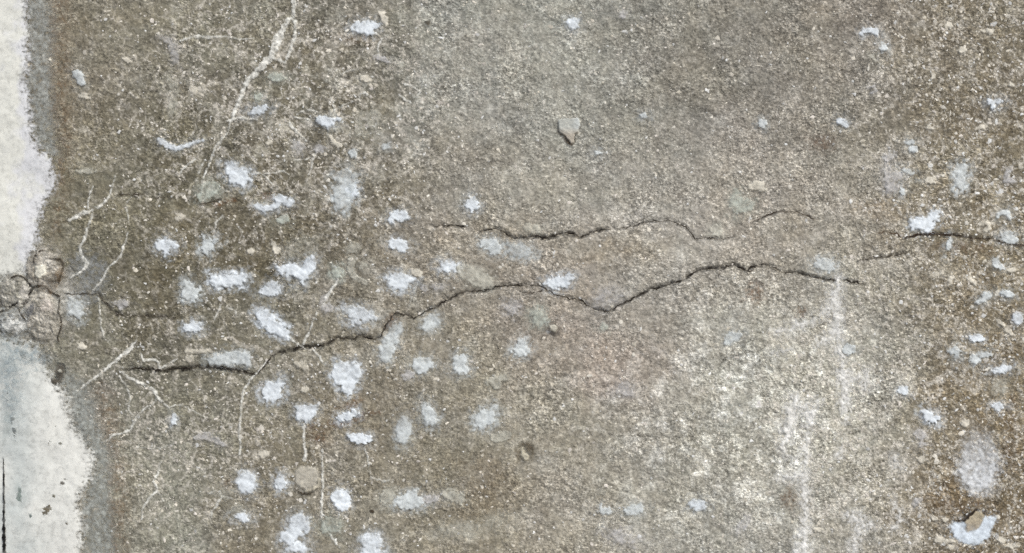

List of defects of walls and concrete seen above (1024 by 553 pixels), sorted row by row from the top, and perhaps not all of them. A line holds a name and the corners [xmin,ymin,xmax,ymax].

crack [434,220,733,240]
crack [754,210,814,221]
crack [0,250,176,342]
crack [127,231,1024,375]